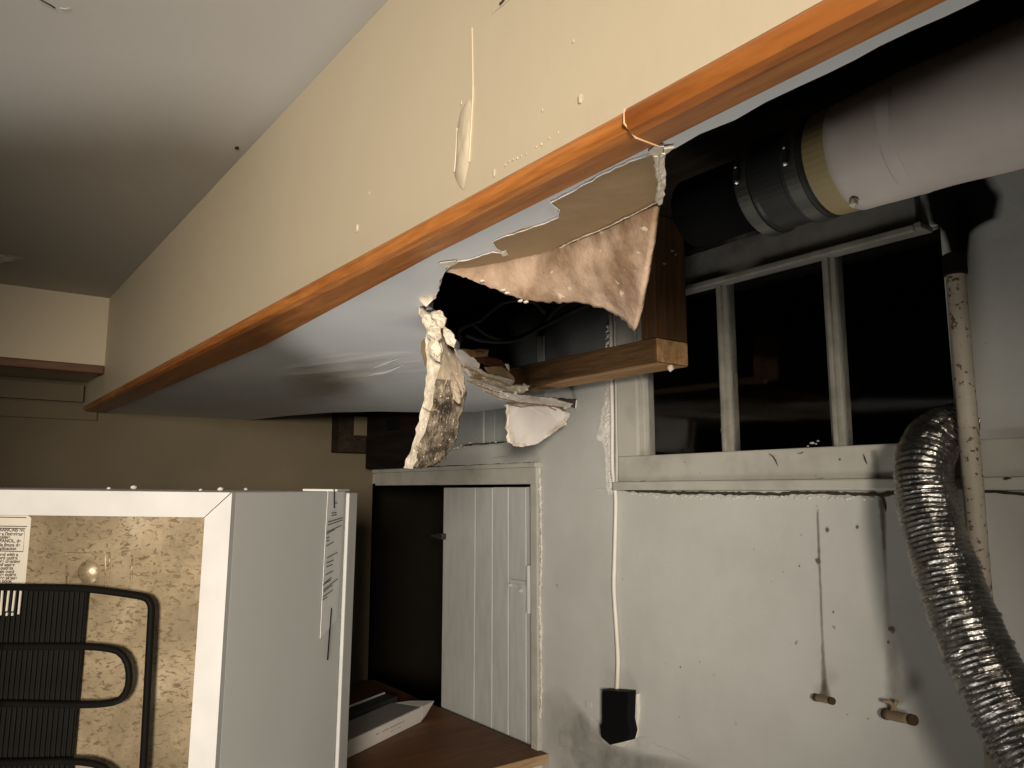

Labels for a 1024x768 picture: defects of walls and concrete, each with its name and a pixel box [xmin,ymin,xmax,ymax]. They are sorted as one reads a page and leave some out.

peeling [419,144,674,310]
flaking render [450,441,509,451]